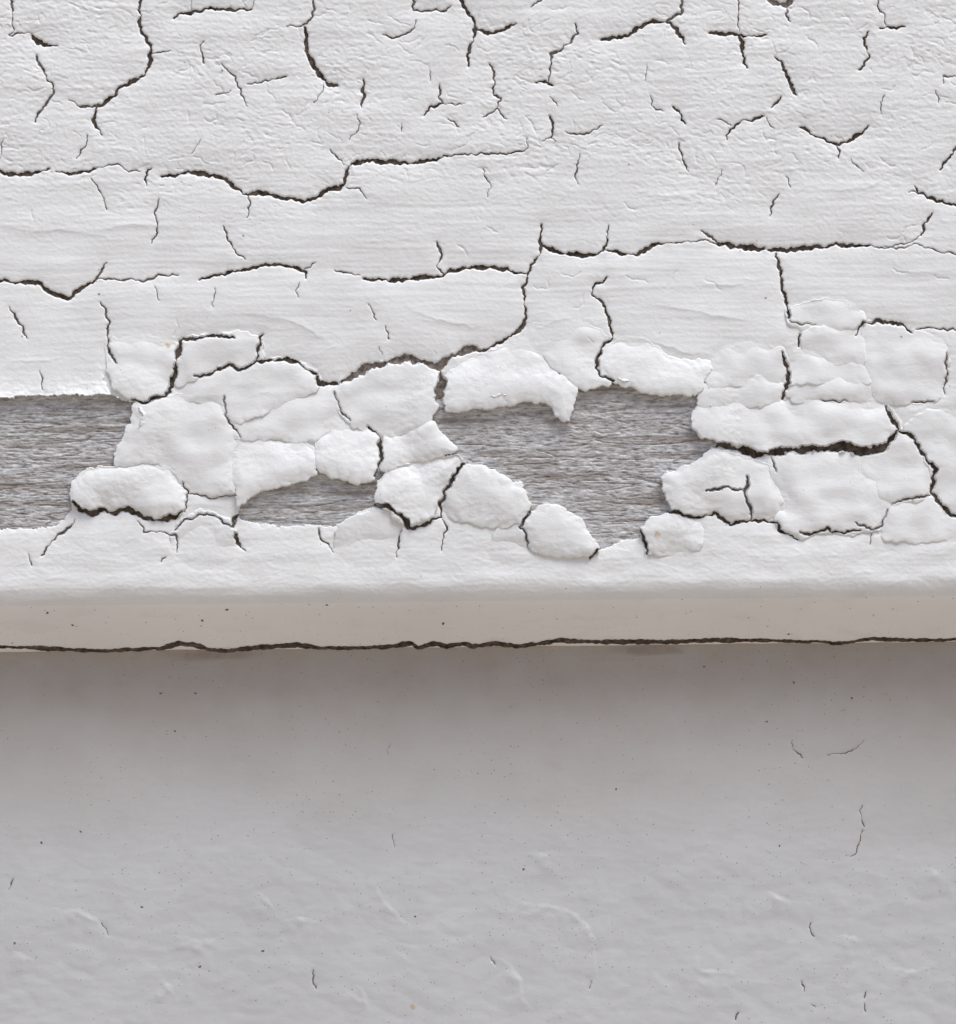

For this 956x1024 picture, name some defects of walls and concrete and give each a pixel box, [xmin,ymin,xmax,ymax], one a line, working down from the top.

crack [0,0,956,476]
crack [28,482,245,565]
peeling [0,325,784,559]
crack [374,463,465,557]
crack [667,318,956,544]
crack [0,637,956,653]